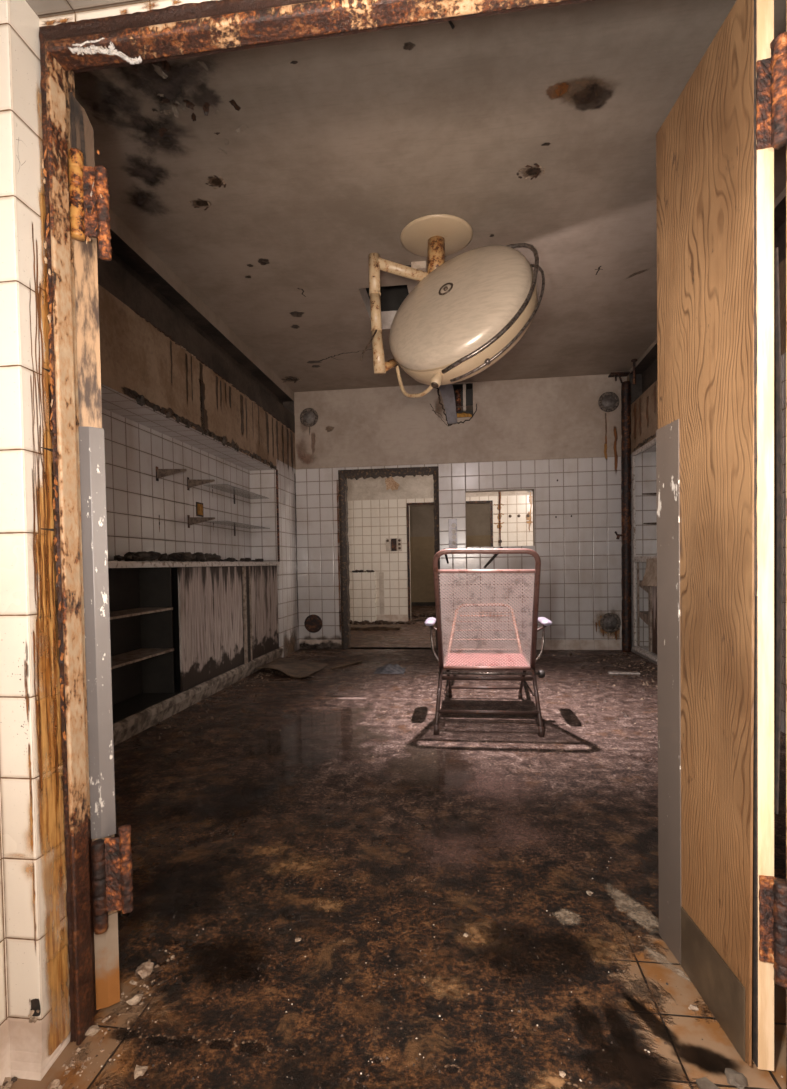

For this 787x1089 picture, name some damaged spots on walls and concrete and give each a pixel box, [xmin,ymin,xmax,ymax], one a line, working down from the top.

damp [68,38,241,151]
damp [547,78,612,110]
damp [127,158,167,211]
damp [121,353,312,620]
rust [24,91,71,1055]
damp [284,634,342,657]